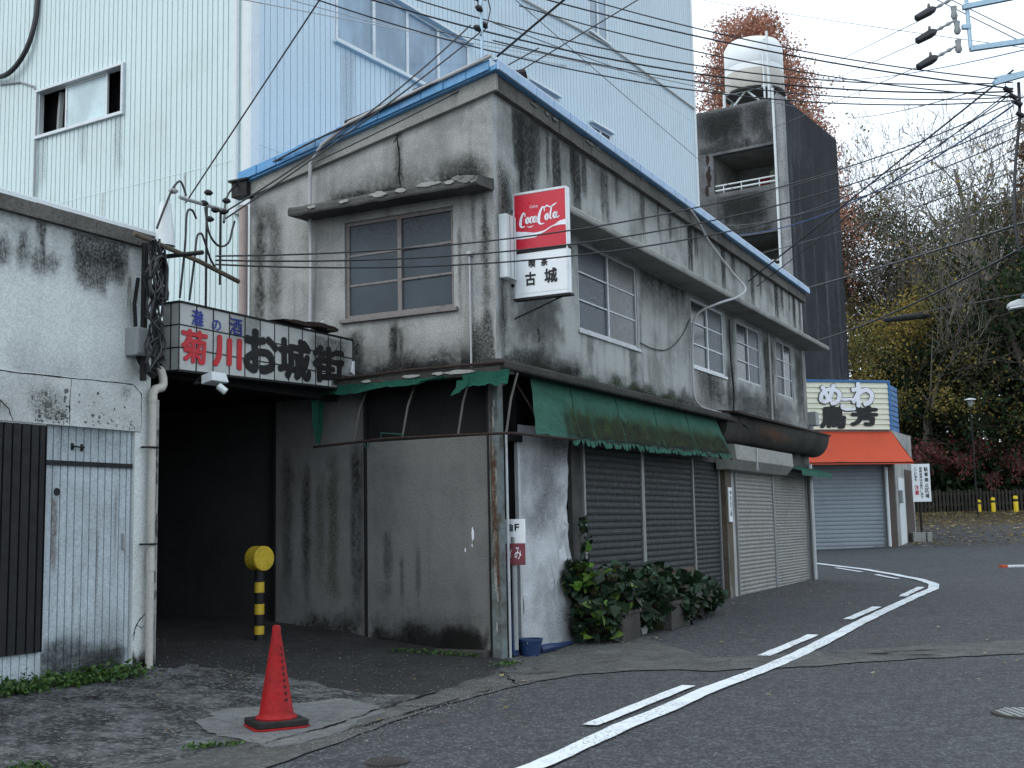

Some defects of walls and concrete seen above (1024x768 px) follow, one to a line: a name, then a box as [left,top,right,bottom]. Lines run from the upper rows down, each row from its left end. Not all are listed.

crack [393,134,404,188]
damp [498,112,586,214]
damp [20,222,57,269]
damp [73,233,128,286]
damp [461,299,579,376]